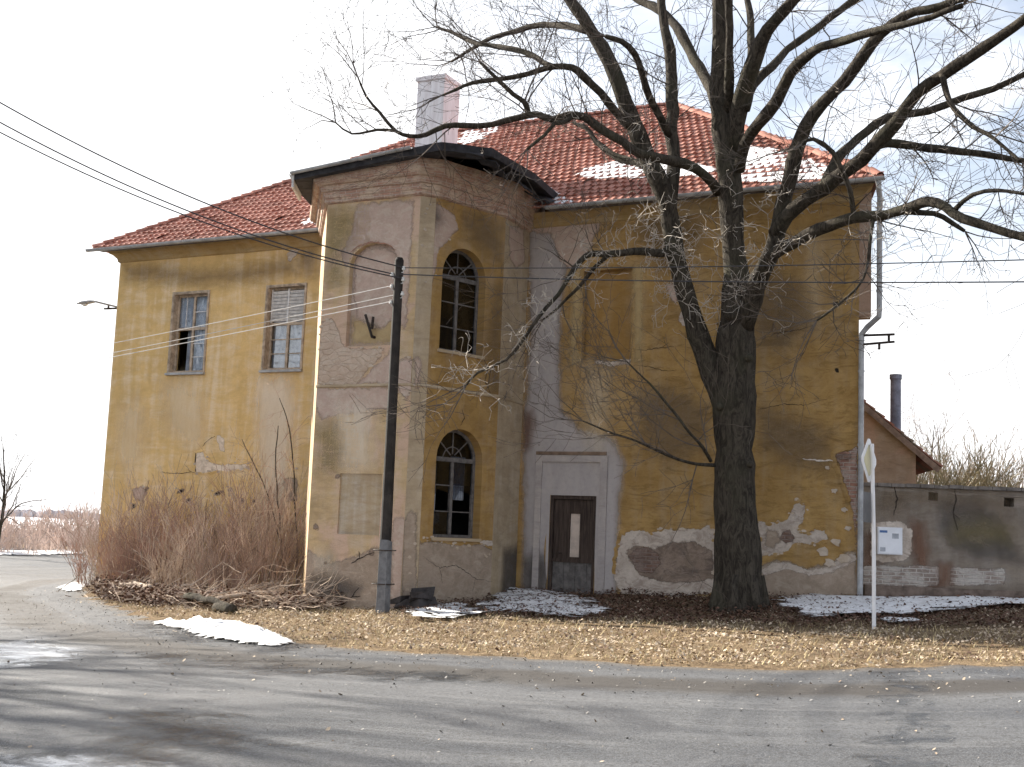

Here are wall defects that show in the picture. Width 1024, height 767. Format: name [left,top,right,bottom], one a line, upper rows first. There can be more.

peeling [342,200,461,328]
flaking render [193,435,255,503]
flaking render [612,519,715,597]
flaking render [758,445,1005,598]